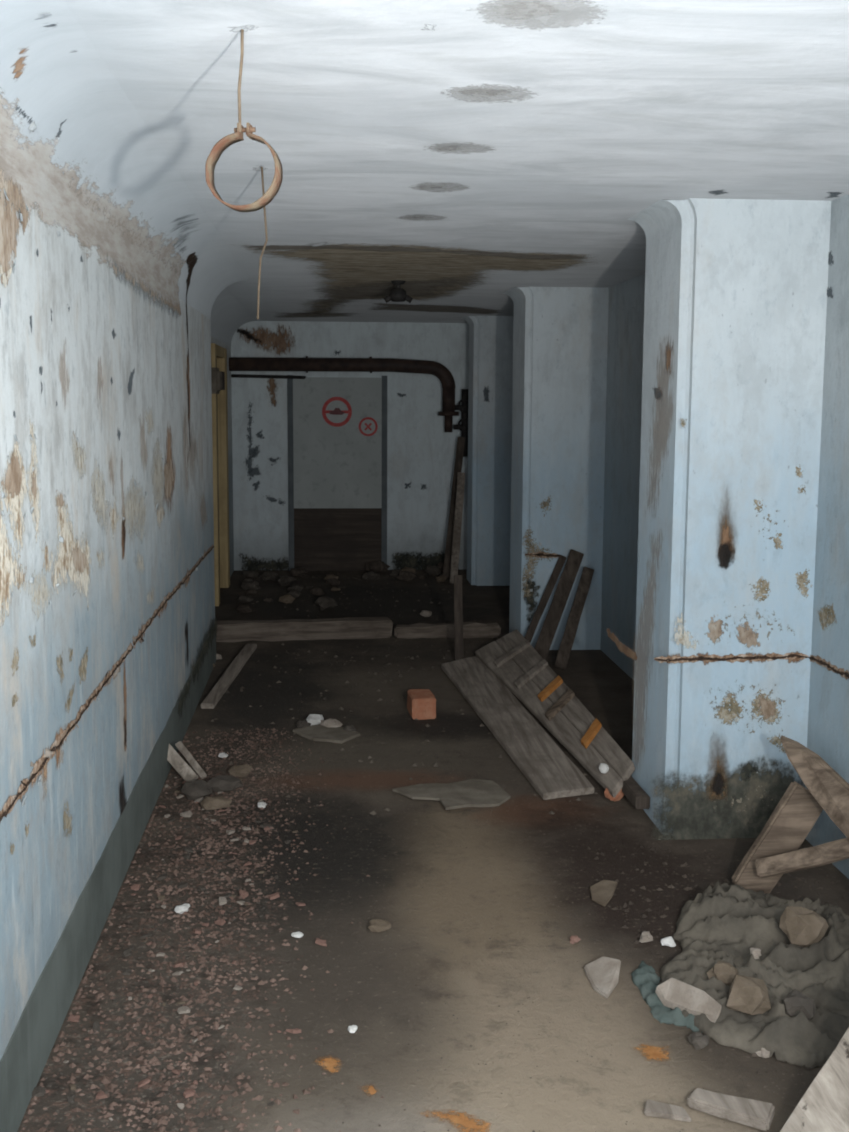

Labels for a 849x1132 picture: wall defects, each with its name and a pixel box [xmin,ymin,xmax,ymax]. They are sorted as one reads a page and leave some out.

peeling [0,95,187,316]
water stain [373,303,500,314]
peeling [0,411,105,627]
peeling [671,576,795,650]
peeling [795,568,813,598]
peeling [818,603,837,630]
crack [0,544,214,822]
crack [606,628,849,680]
peeling [709,680,786,753]
water stain [653,758,804,840]